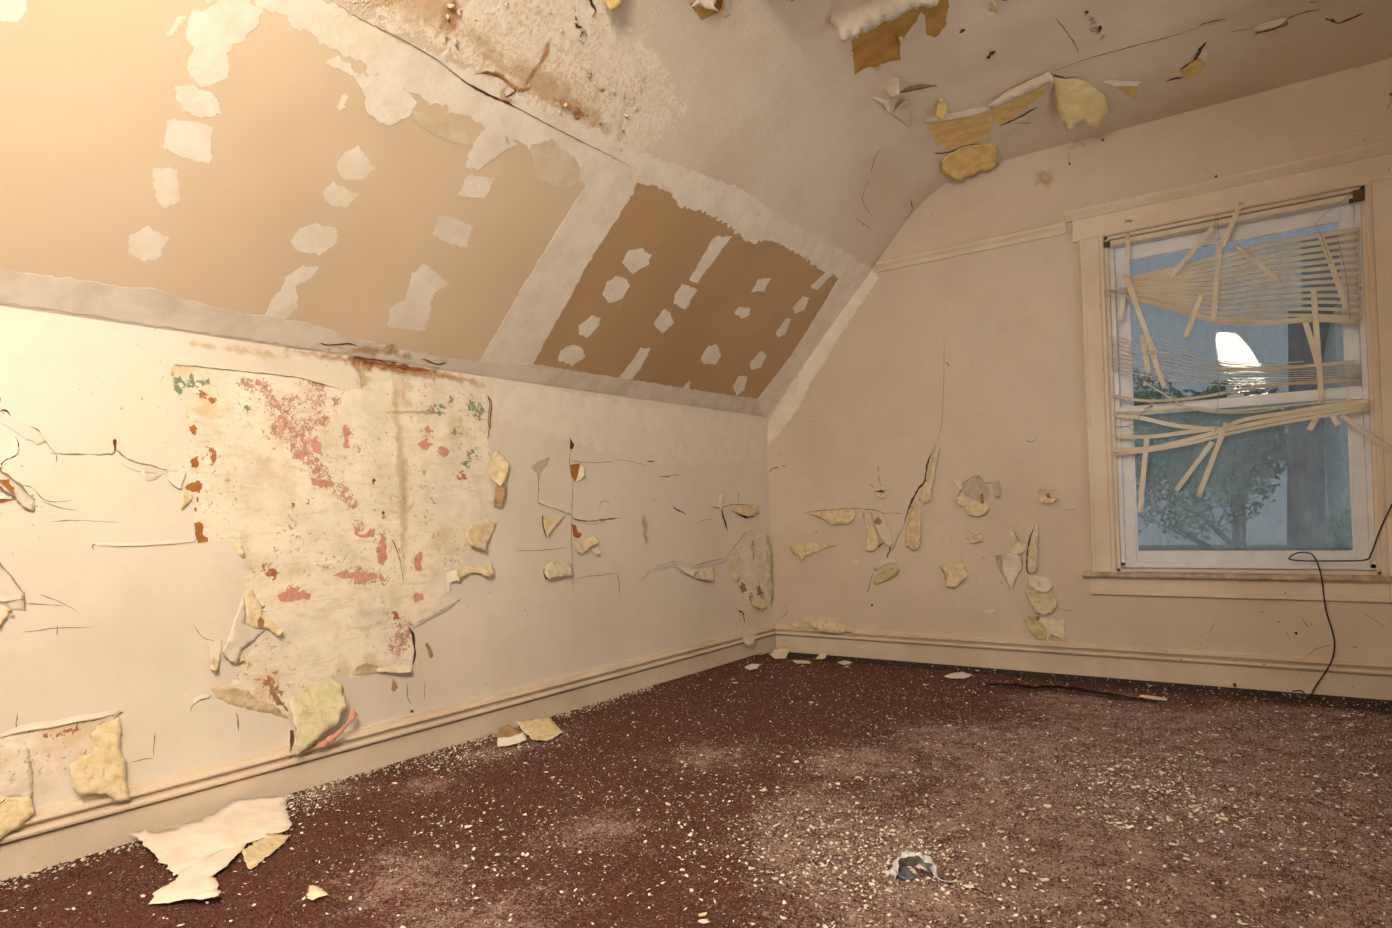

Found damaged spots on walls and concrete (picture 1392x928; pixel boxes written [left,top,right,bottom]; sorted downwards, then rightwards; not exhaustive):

damp [386,0,459,30]
peeling [361,0,689,153]
crack [27,626,86,634]
crack [0,398,196,550]
peeling [164,364,510,759]
peeling [532,457,601,580]
peeling [643,492,773,647]
peeling [804,442,939,592]
peeling [951,476,1000,517]
peeling [995,521,1072,642]
peeling [0,710,155,840]